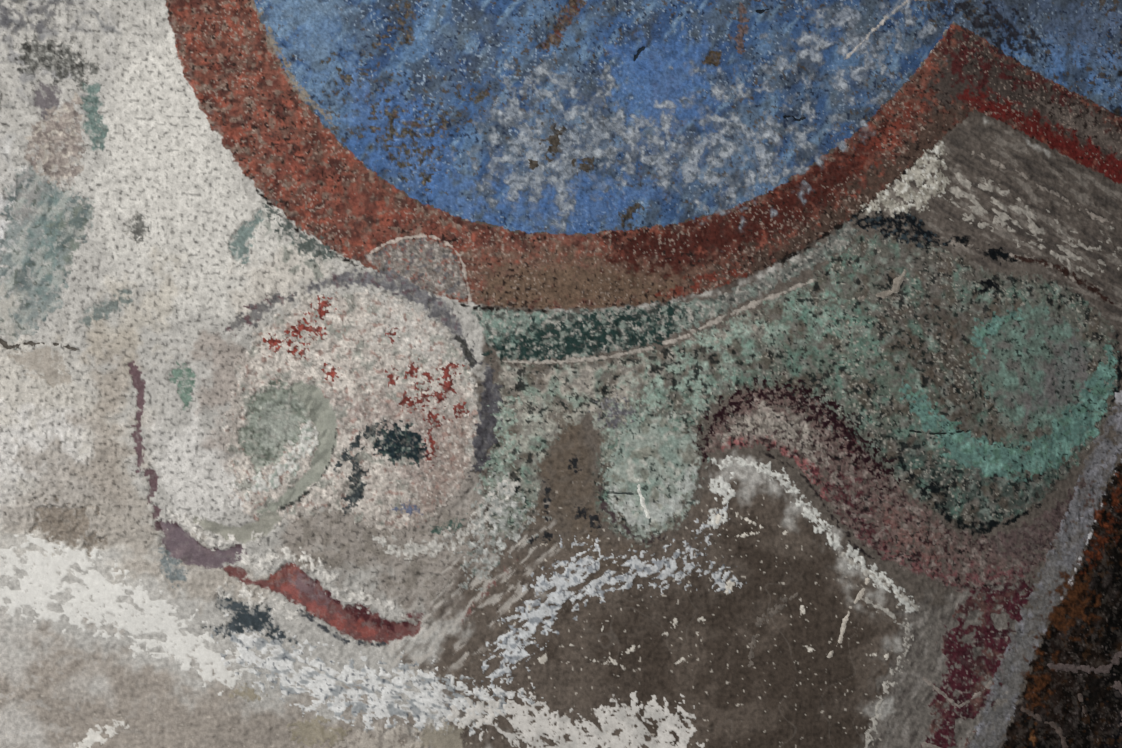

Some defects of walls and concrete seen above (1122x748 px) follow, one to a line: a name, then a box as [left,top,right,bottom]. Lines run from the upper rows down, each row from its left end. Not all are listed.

peeling [559,535,590,548]
peeling [691,497,730,550]
peeling [706,455,920,676]
peeling [477,653,544,700]